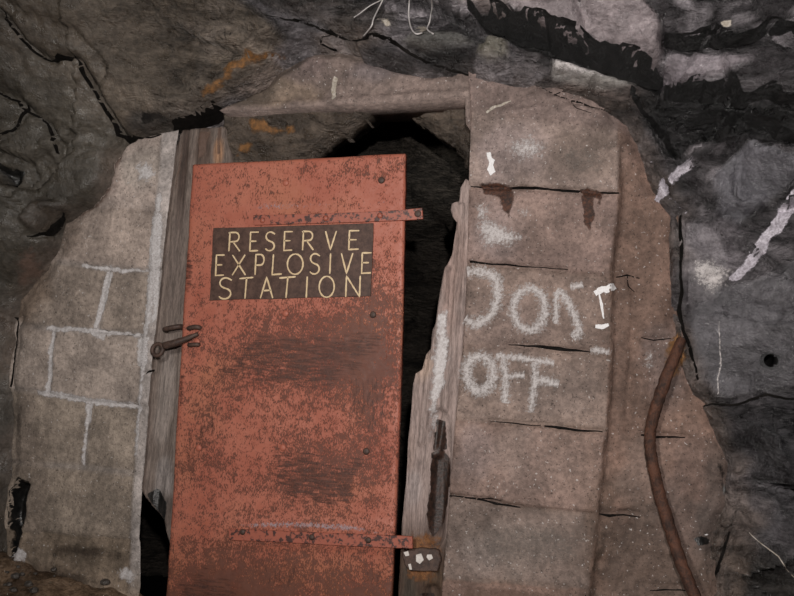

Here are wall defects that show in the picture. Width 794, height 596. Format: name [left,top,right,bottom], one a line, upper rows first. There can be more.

crack [471,186,619,194]
rust [481,183,514,216]
rust [580,188,602,229]
crack [469,260,568,270]
crack [508,344,591,353]
crack [491,421,603,432]
crack [449,495,520,508]
spalling [5,477,31,573]